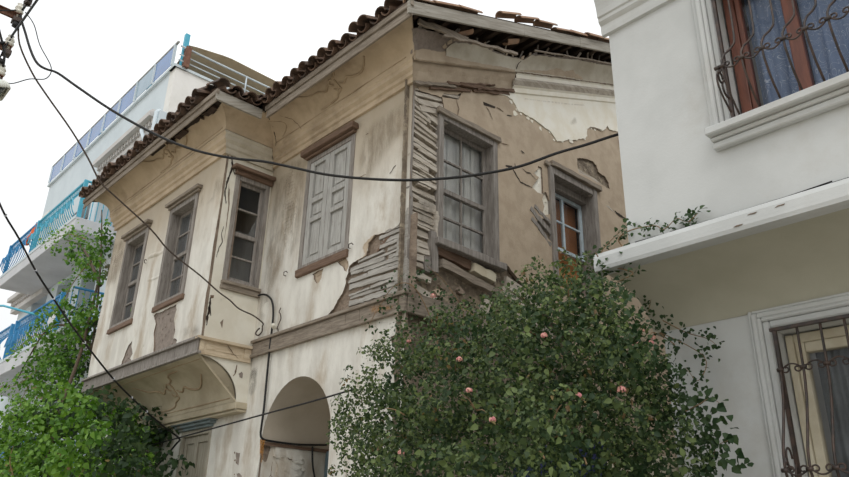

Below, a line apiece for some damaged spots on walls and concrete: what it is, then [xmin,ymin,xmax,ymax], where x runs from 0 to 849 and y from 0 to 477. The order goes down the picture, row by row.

flaking render [414,39,614,86]
flaking render [333,79,618,313]
flaking render [155,306,177,351]